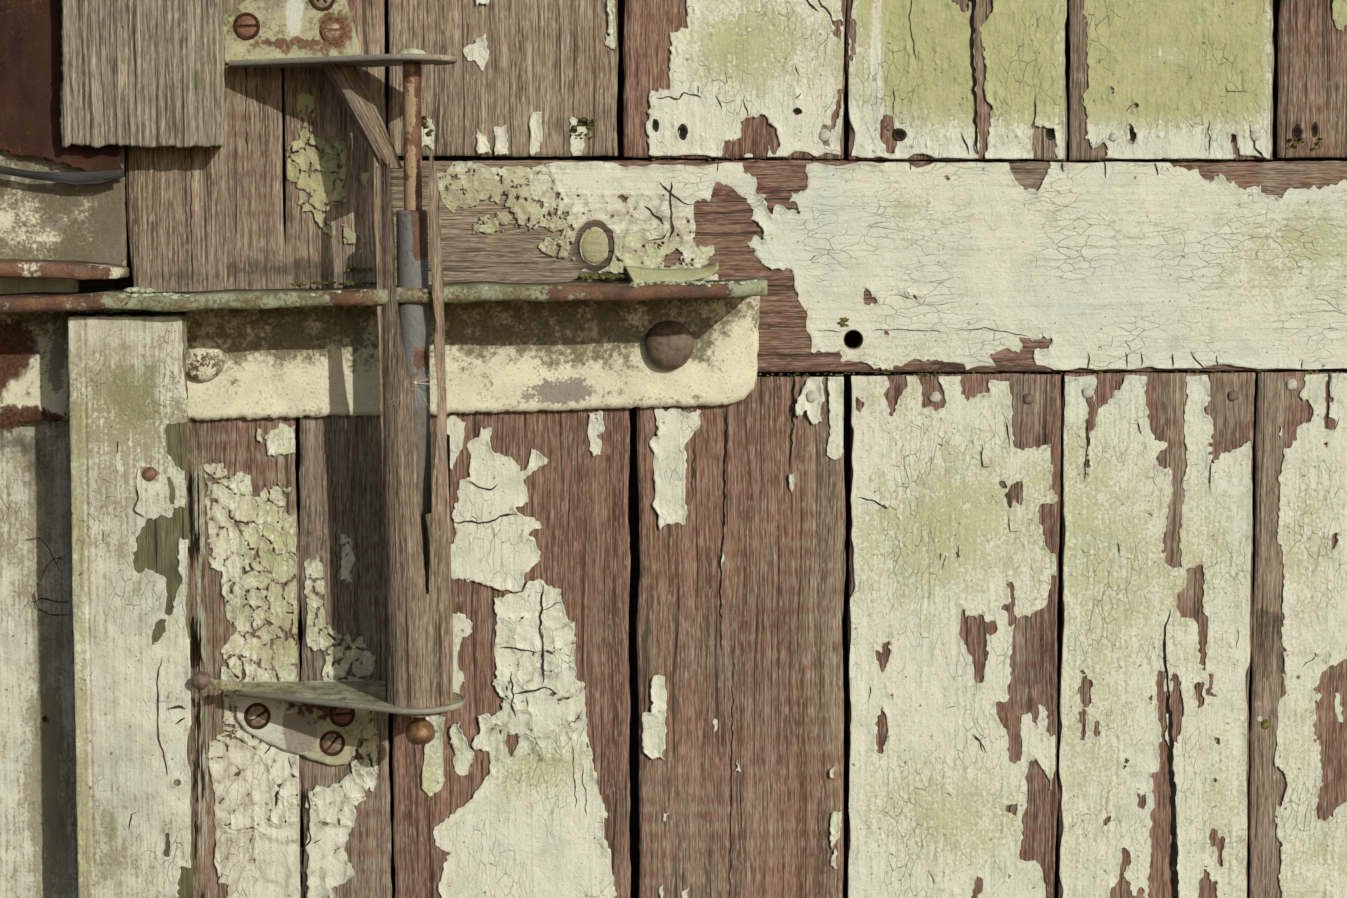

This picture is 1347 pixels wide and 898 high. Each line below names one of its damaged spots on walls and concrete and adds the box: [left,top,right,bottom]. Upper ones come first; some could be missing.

peeling [476,125,508,155]
peeling [1008,0,1109,191]
peeling [1169,140,1347,198]
corrosion [0,319,66,429]
peeling [625,114,1060,898]
peeling [1085,375,1124,475]
peeling [133,422,379,898]
peeling [422,410,617,898]
peeling [1110,374,1216,898]
peeling [1204,373,1336,898]
peeling [1313,647,1347,821]
peeling [1198,829,1225,898]